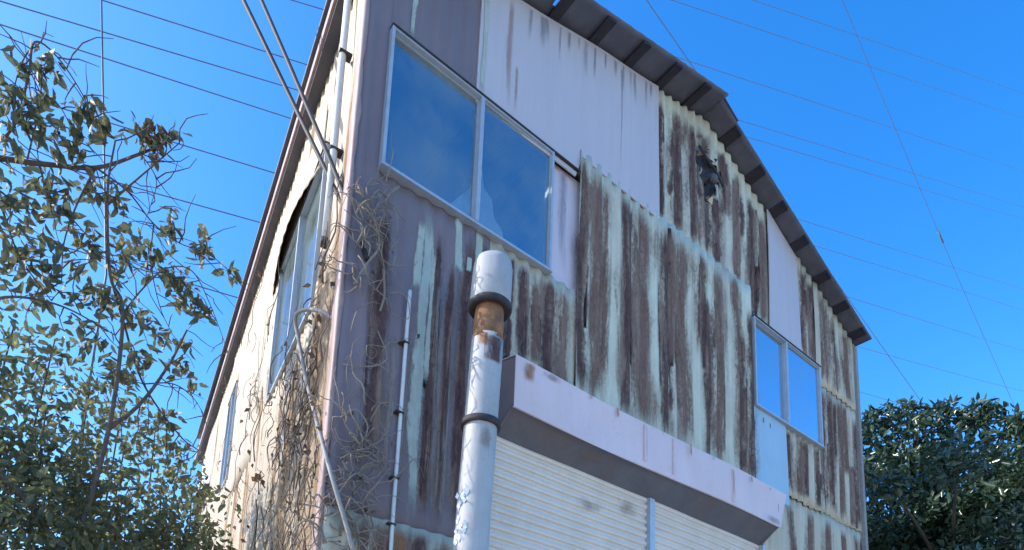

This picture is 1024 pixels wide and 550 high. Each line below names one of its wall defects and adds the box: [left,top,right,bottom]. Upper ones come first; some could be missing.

rust [418,107,771,509]
rust [786,274,861,528]
rust [790,510,862,550]